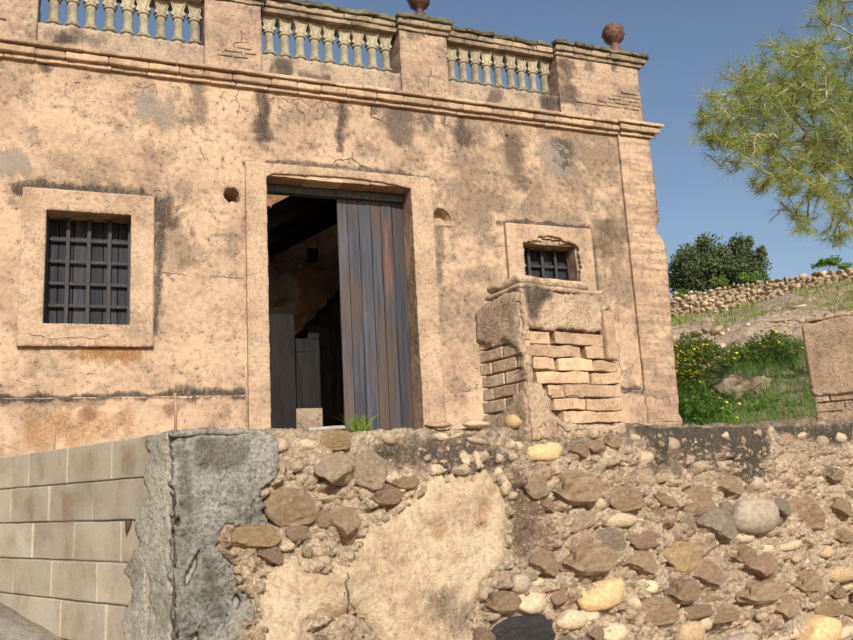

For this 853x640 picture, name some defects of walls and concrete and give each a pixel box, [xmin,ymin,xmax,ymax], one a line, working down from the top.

water stain [254,90,273,141]
water stain [335,101,346,152]
water stain [387,108,413,145]
water stain [12,180,178,335]
water stain [525,278,551,316]
flaking render [515,288,626,441]
water stain [0,386,246,404]
water stain [634,422,853,478]
flaking render [255,450,512,640]
crack [344,572,367,624]